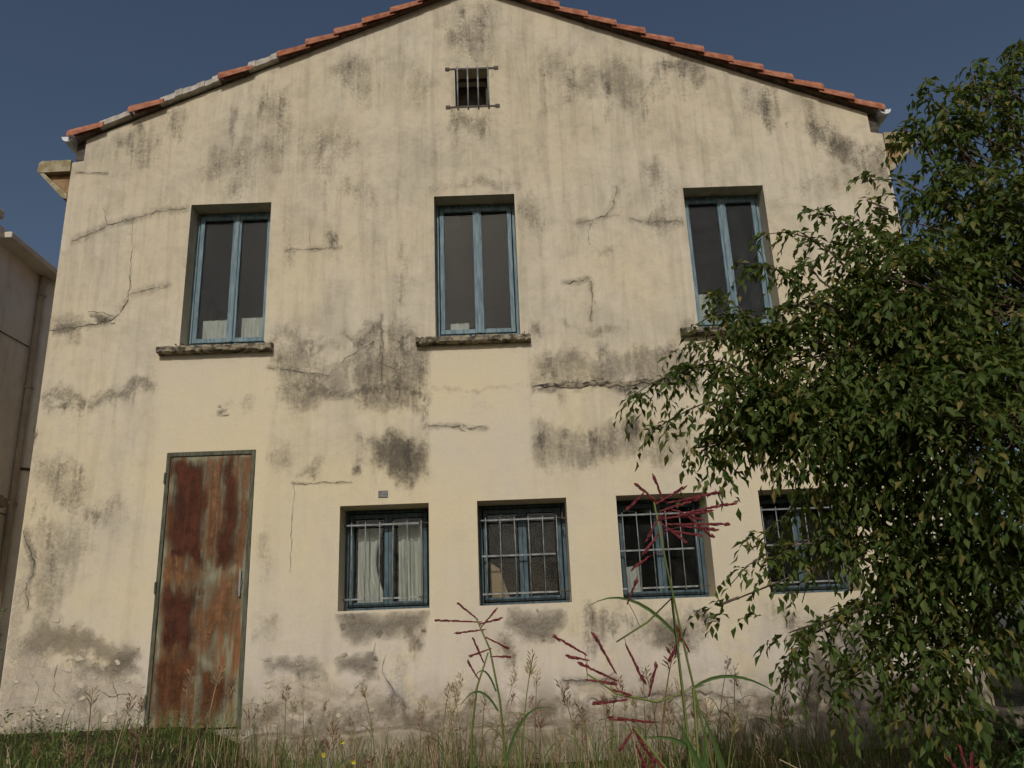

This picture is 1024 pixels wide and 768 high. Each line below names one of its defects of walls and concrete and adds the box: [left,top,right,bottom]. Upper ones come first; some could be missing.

crack [50,208,186,331]
damp [376,432,425,479]
corrosion [166,460,207,570]
corrosion [216,458,246,566]
crack [290,481,344,567]
corrosion [151,586,233,718]